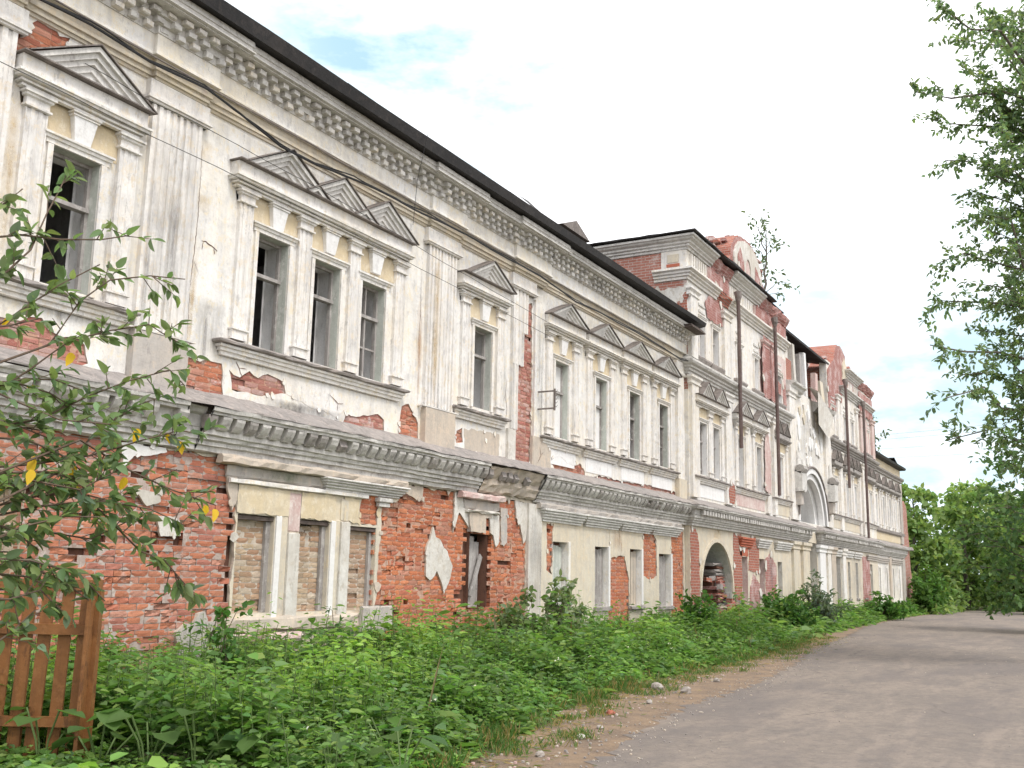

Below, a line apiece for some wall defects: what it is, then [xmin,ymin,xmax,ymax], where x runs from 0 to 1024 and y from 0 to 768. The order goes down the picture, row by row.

flaking render [16,19,71,51]
flaking render [655,283,689,311]
flaking render [705,266,729,328]
flaking render [186,358,383,430]
flaking render [397,404,417,438]
flaking render [515,303,675,495]
flaking render [756,305,787,410]
spalling [0,426,239,674]
spalling [358,486,527,641]
spalling [642,533,658,582]
spalling [671,526,702,617]
flaking render [733,533,779,617]